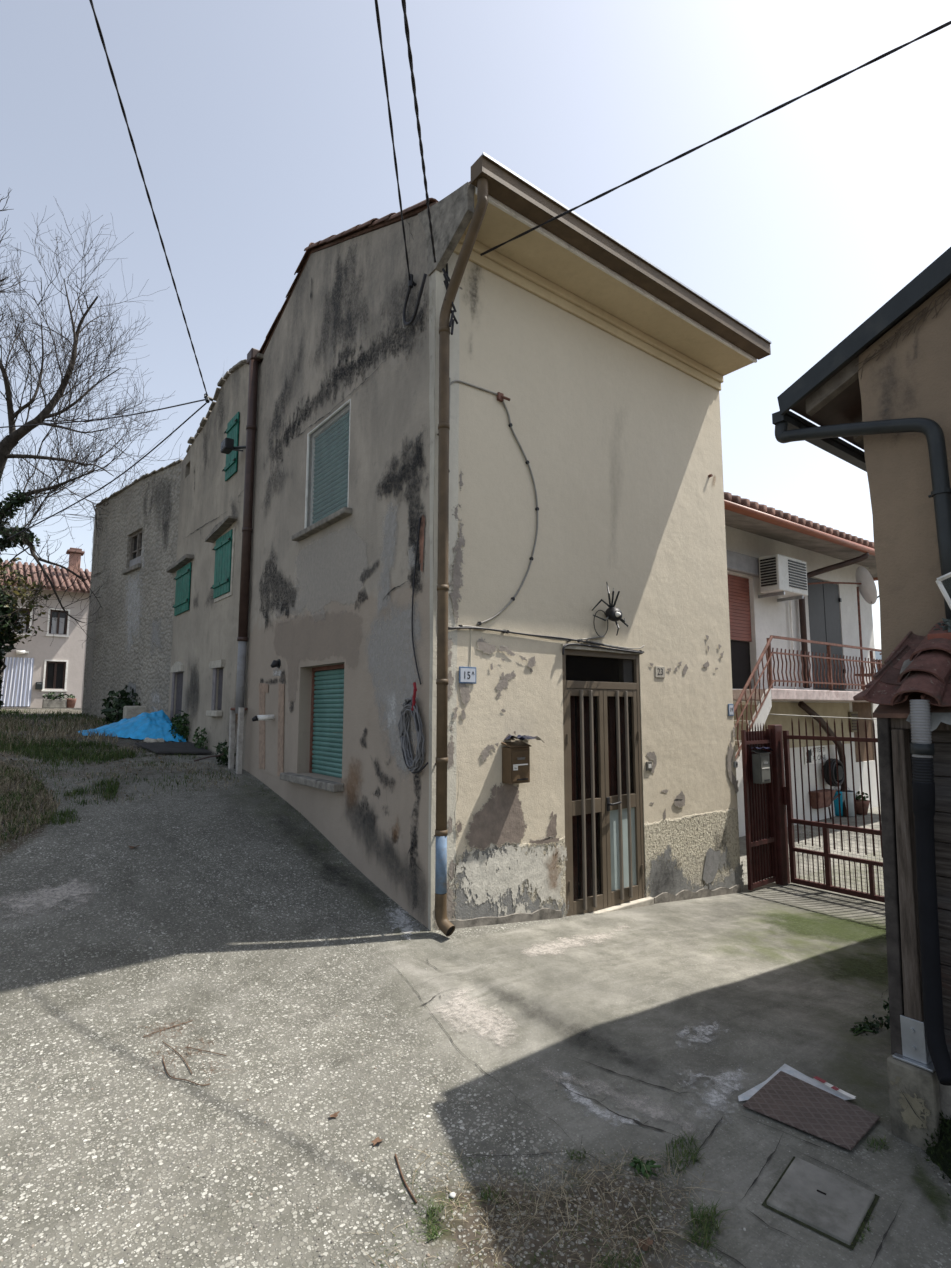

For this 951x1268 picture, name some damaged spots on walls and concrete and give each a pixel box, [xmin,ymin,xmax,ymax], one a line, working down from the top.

leakage [265,257,425,507]
leakage [377,434,427,591]
leakage [259,556,296,627]
peeling [476,637,536,712]
leakage [347,762,425,936]
peeling [434,783,569,930]
peeling [644,844,744,898]
crack [321,914,618,1171]
crack [559,1056,902,1268]